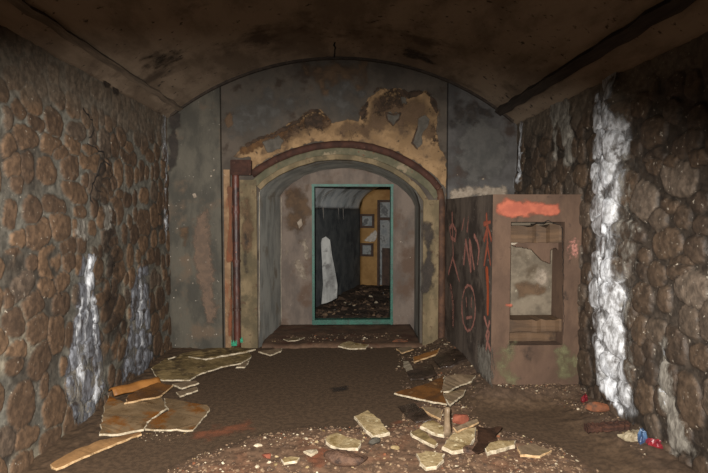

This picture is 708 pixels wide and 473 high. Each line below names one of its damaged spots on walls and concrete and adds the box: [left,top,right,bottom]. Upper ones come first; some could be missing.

damp [65,159,153,423]
flaking render [234,88,507,199]
damp [588,72,640,415]